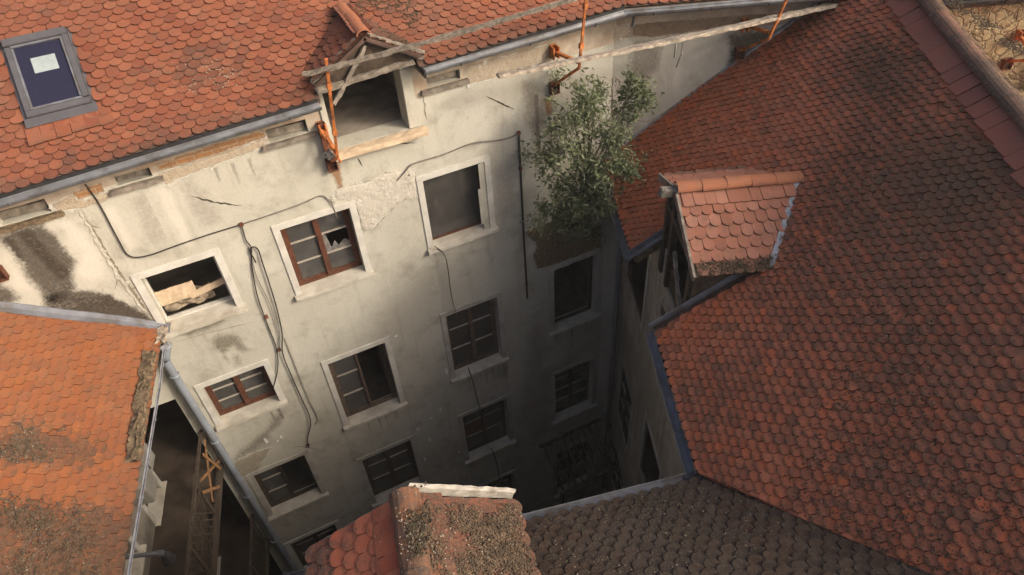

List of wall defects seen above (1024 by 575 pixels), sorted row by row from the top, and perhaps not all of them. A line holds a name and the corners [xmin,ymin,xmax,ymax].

peeling [156,129,267,188]
spalling [330,167,418,230]
damp [0,162,242,320]